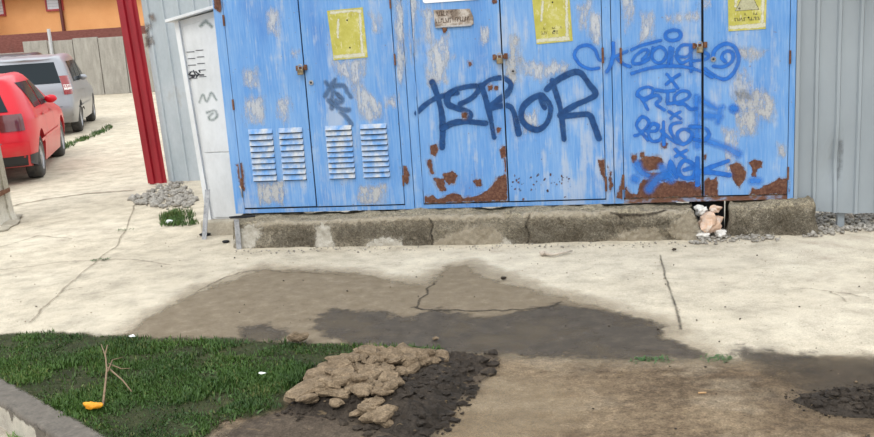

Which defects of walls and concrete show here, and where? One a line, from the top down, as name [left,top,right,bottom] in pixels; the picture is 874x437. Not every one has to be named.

rust [424,144,571,203]
rust [598,143,718,199]
rust [730,160,762,188]
rust [750,178,790,195]
damp [125,262,722,360]
crack [415,281,562,311]
crack [660,257,682,329]